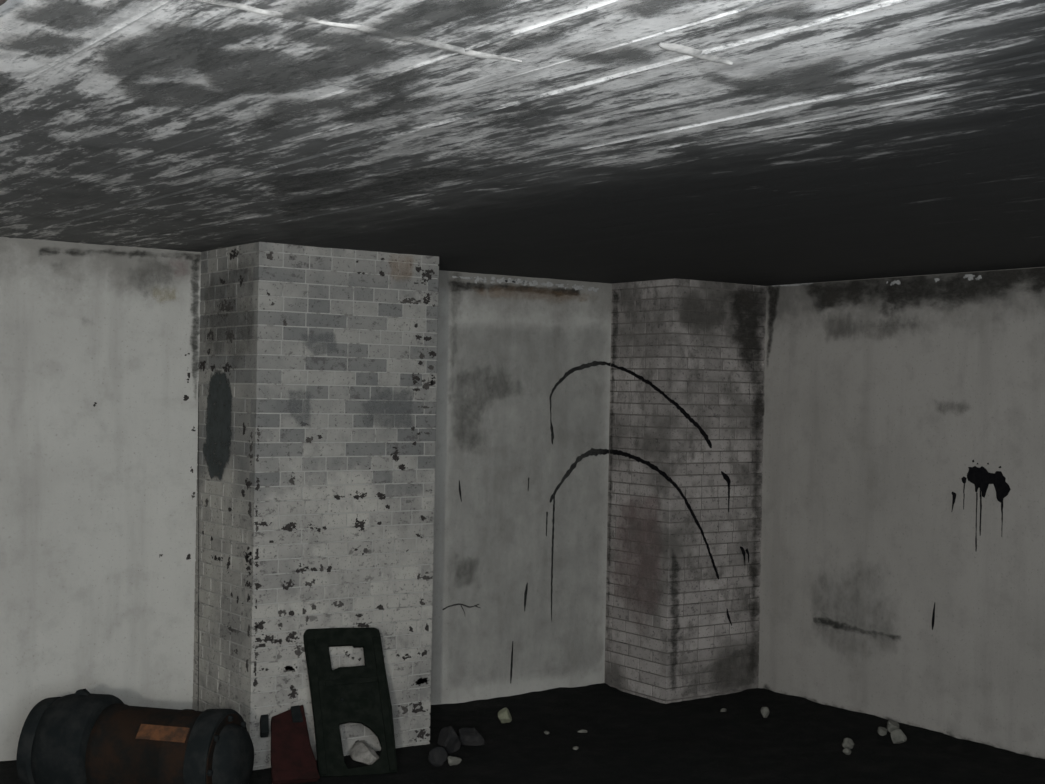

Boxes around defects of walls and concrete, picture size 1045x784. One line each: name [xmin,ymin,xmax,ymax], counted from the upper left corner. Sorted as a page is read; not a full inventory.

water stain [203,369,232,481]
water stain [549,293,719,580]
water stain [671,557,679,684]